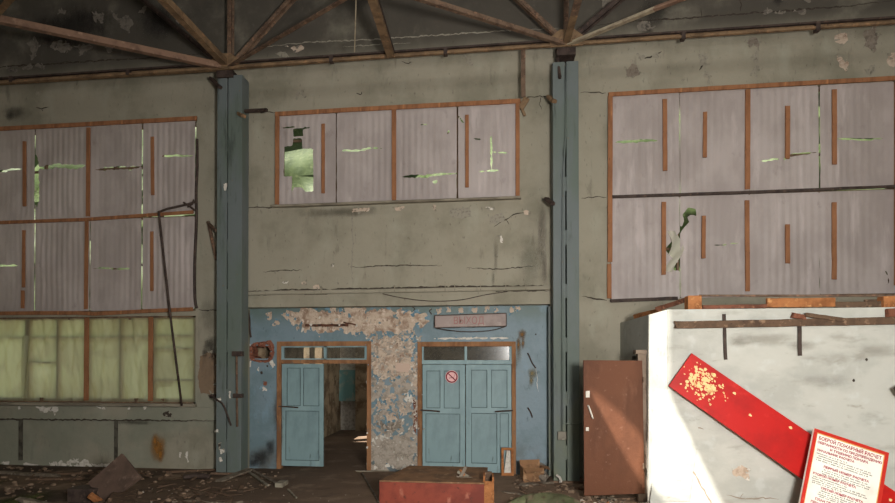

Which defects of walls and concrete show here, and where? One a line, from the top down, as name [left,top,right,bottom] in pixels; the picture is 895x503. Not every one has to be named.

crack [248,265,545,315]
peeling [196,350,231,402]
peeling [266,306,521,470]
peeling [49,458,110,467]